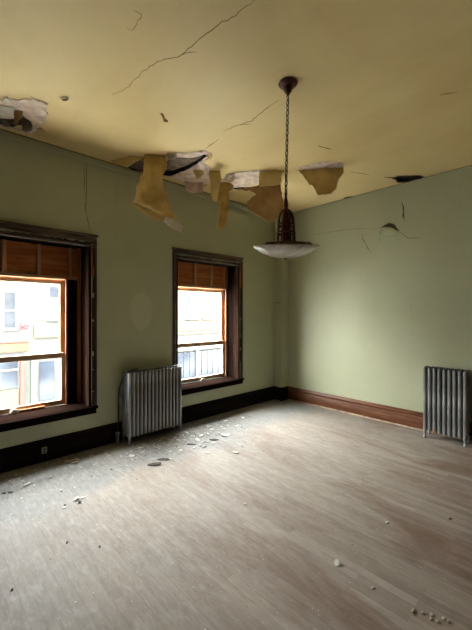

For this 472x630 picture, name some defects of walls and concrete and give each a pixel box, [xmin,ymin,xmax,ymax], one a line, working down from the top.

crack [112,0,255,95]
spalling [0,97,48,135]
peeling [112,151,285,233]
peeling [295,161,344,195]
spalling [384,175,424,183]